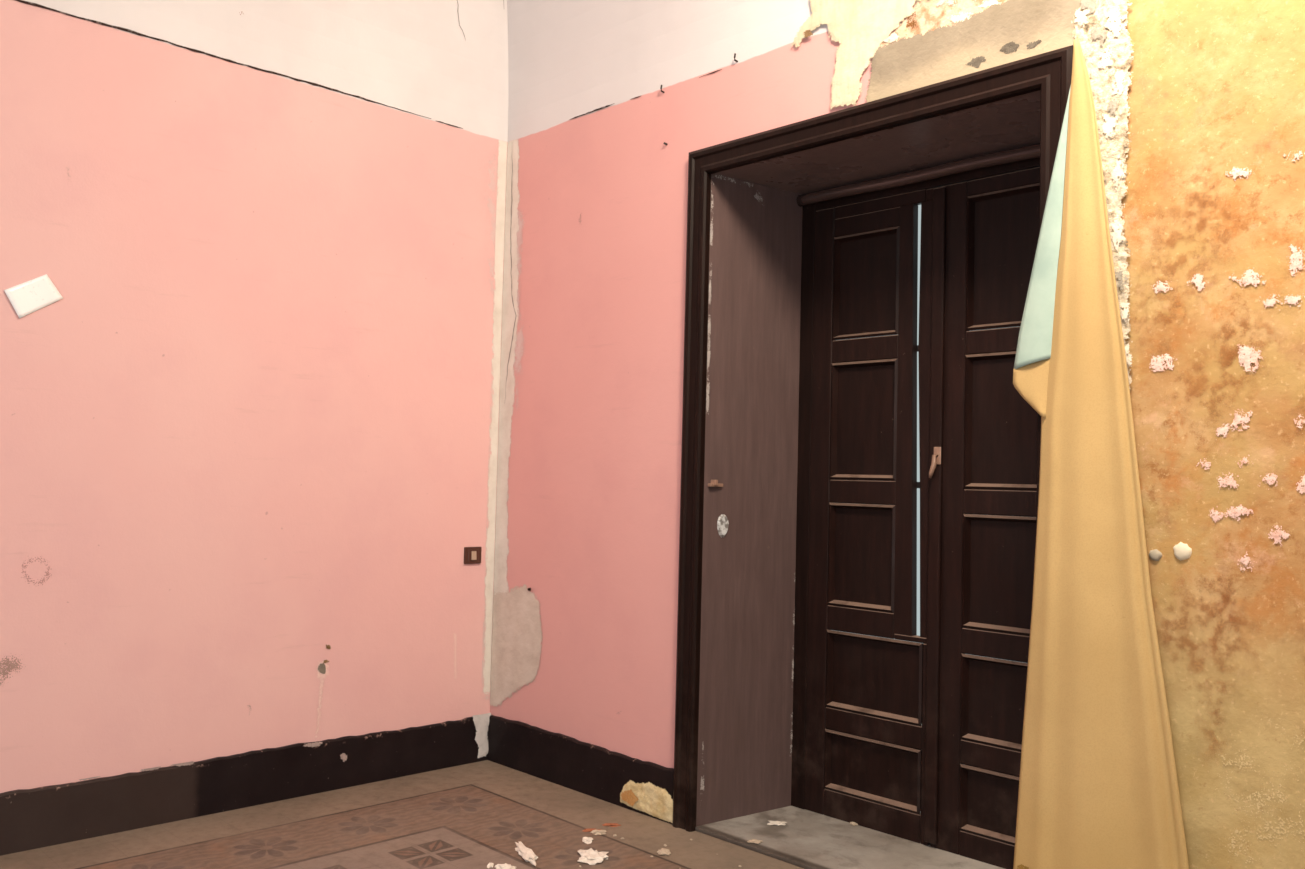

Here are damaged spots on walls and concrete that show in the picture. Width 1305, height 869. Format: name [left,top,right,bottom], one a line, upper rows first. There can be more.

flaking render [880,0,1007,48]
flaking render [967,56,986,68]
flaking render [1000,40,1041,54]
peeling [1071,0,1305,869]
flaking render [620,780,673,823]